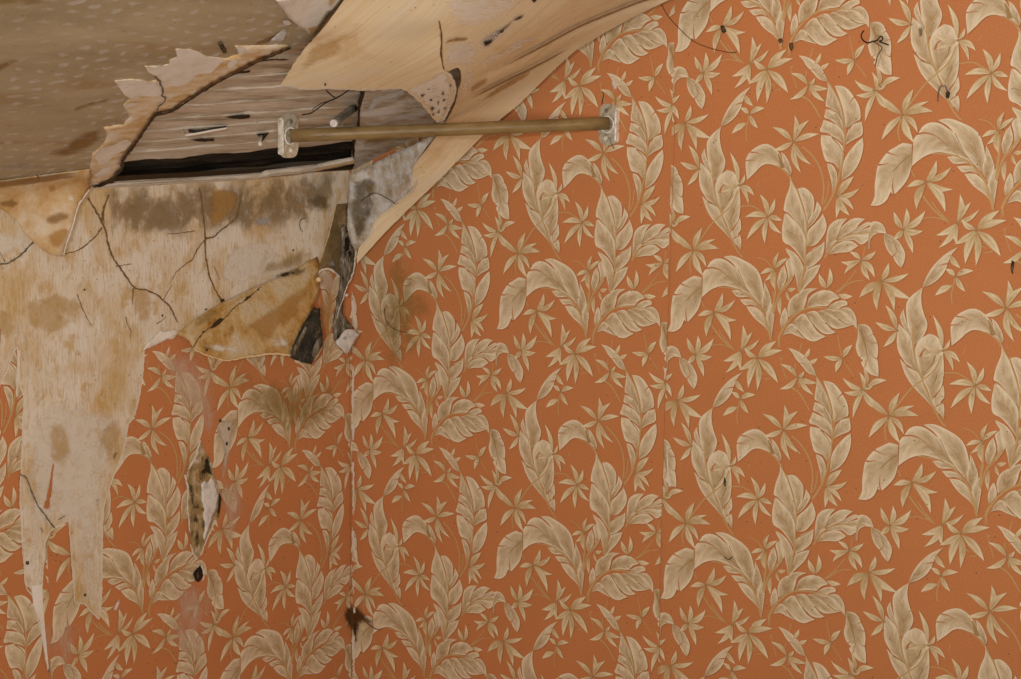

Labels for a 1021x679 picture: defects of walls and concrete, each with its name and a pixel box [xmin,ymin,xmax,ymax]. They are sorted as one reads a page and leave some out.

crack [0,242,34,265]
crack [65,47,291,336]
flaking render [188,115,250,142]
damp [211,191,236,226]
damp [333,225,359,354]
peeling [0,169,349,672]